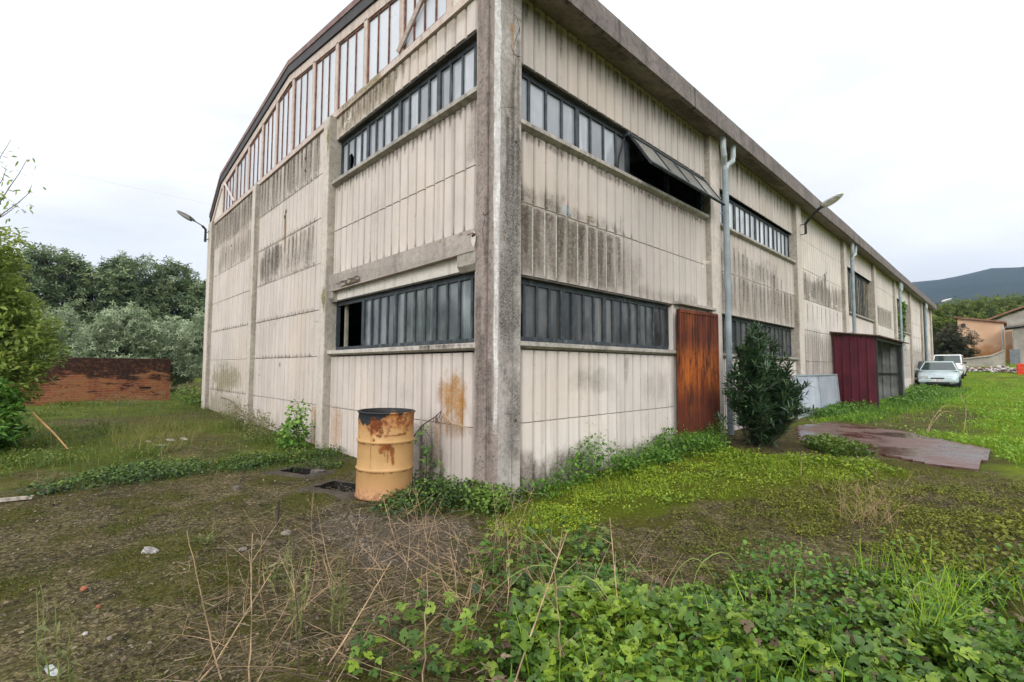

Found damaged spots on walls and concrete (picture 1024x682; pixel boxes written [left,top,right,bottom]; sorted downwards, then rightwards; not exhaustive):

water stain [486,0,620,446]
water stain [260,241,294,277]
water stain [804,278,831,307]
rust [445,376,465,423]